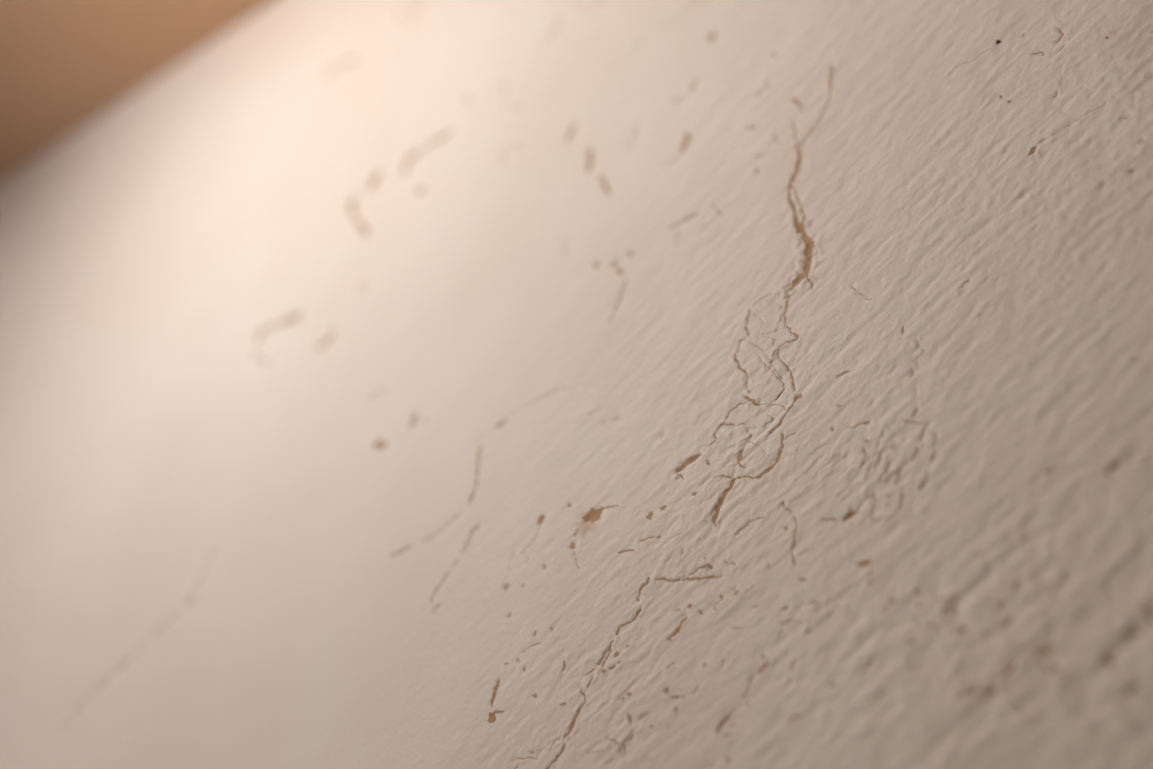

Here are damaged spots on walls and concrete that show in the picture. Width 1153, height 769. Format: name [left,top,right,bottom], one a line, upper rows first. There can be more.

crack [776,67,834,391]
flaking render [677,295,802,526]
crack [781,502,806,581]
crack [515,563,722,769]
crack [717,654,770,736]